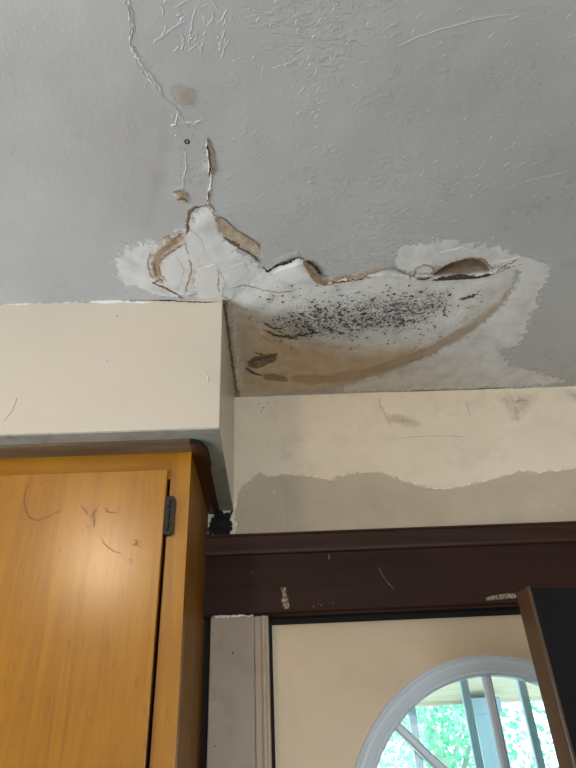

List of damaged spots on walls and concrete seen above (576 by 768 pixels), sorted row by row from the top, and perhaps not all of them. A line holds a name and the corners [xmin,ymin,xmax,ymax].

peeling [63,204,268,304]
crack [124,0,434,397]
water stain [240,285,496,412]
peeling [333,236,571,393]